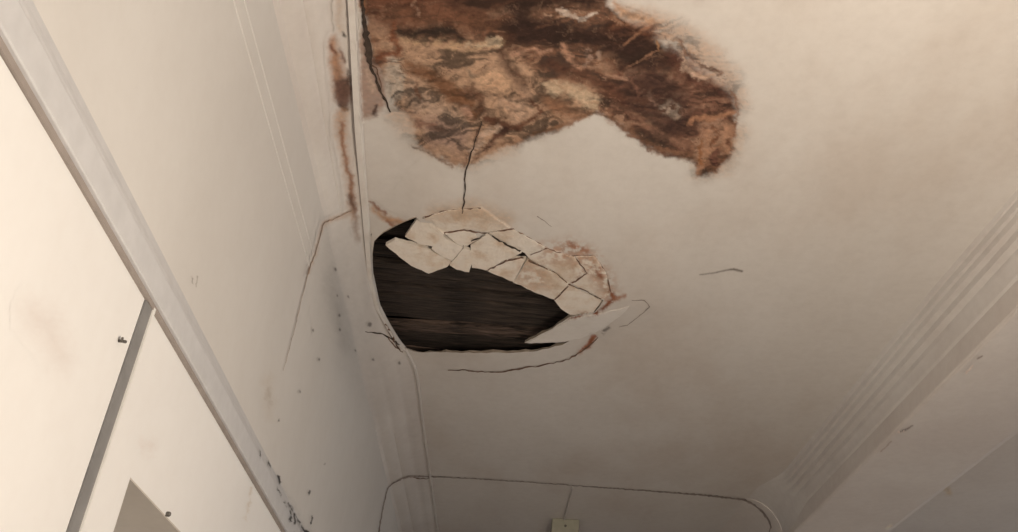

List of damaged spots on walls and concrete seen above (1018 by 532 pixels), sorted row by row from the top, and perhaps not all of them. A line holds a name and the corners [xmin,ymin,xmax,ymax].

crack [361,0,391,112]
water stain [358,0,757,189]
crack [283,208,357,370]
flaking render [373,208,629,343]
crack [448,337,598,373]
crack [423,121,650,327]